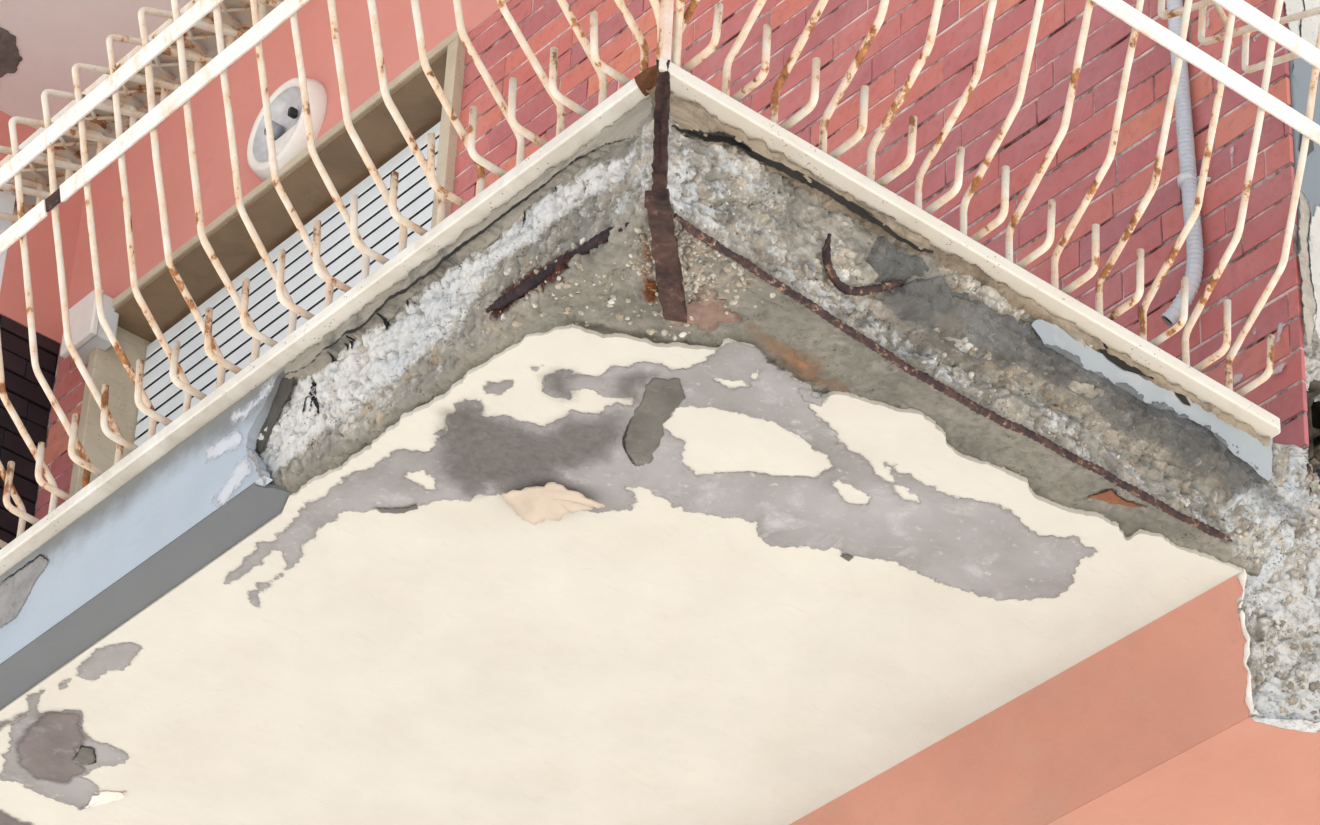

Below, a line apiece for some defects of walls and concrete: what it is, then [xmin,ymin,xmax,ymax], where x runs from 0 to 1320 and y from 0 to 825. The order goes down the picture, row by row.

peeling [1284,0,1320,46]
rust [489,250,570,319]
rust [643,251,658,303]
rust [670,286,742,331]
spalling [1298,190,1320,346]
spalling [224,116,1271,607]
spalling [1255,443,1291,497]
spalling [1306,379,1320,496]
spalling [0,554,49,628]
peeling [0,643,142,810]